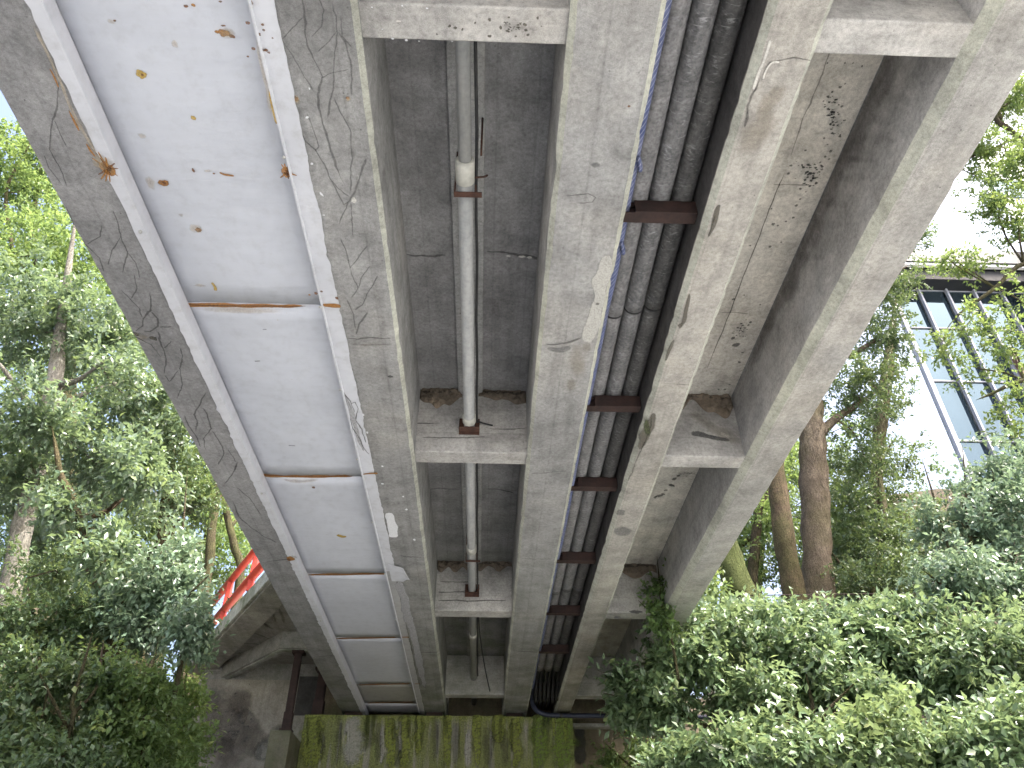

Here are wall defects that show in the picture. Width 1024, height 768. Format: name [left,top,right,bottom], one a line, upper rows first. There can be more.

crack [45,88,66,183]
rust [86,144,118,181]
crack [284,1,390,340]
leakage [771,83,846,226]
rust [188,283,341,308]
crack [67,210,285,562]
spalling [420,388,462,408]
spalling [478,389,526,405]
spalling [682,393,733,419]
spalling [437,560,512,572]
spalling [622,563,657,579]
leakage [344,716,365,762]